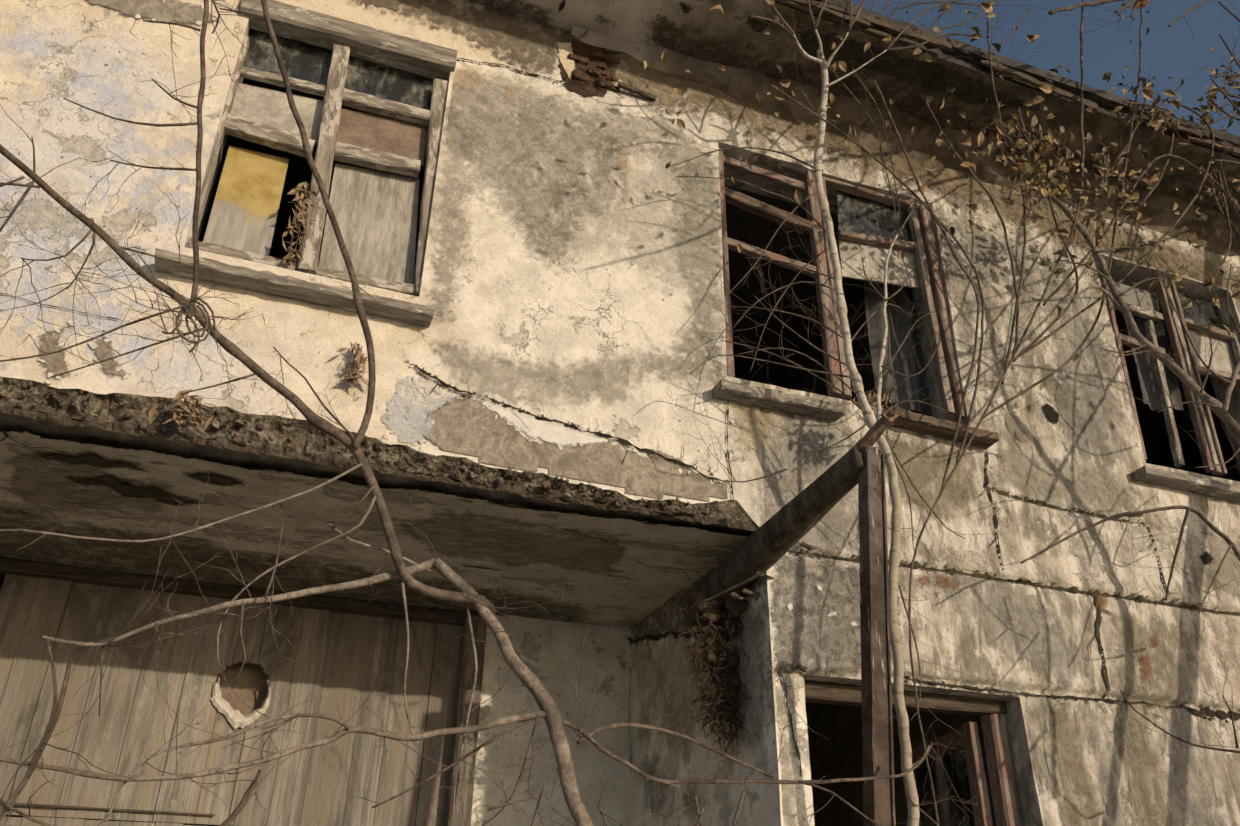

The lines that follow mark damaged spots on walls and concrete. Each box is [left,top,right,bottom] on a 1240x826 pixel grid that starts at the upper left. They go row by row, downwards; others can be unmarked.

peeling [85,0,222,25]
peeling [557,42,575,79]
leakage [349,0,1240,515]
spalling [0,320,855,531]
crack [405,360,734,502]
crack [788,448,1240,723]